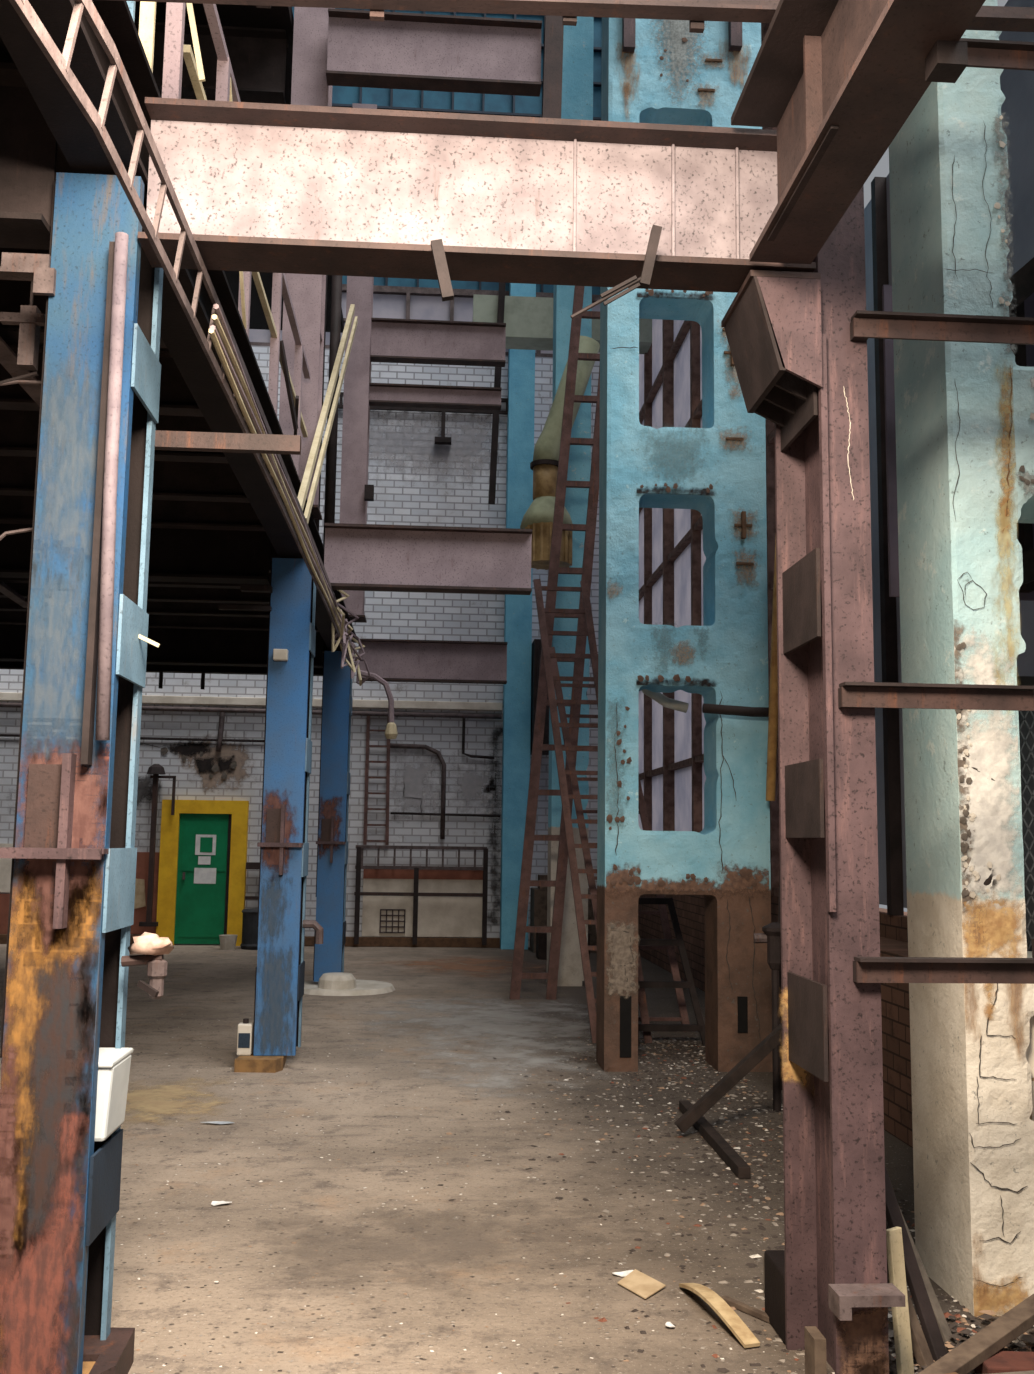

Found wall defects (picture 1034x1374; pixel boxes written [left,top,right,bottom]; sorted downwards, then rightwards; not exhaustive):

corrosion [996,368,1016,683]
peeling [954,620,1011,685]
spalling [161,741,237,779]
corrosion [259,792,296,1055]
corrosion [318,797,342,856]
peeling [606,864,769,897]
peeling [954,709,1023,912]
corrosion [0,742,110,1374]
crack [969,984,1027,1244]
corrosion [973,1272,1028,1317]